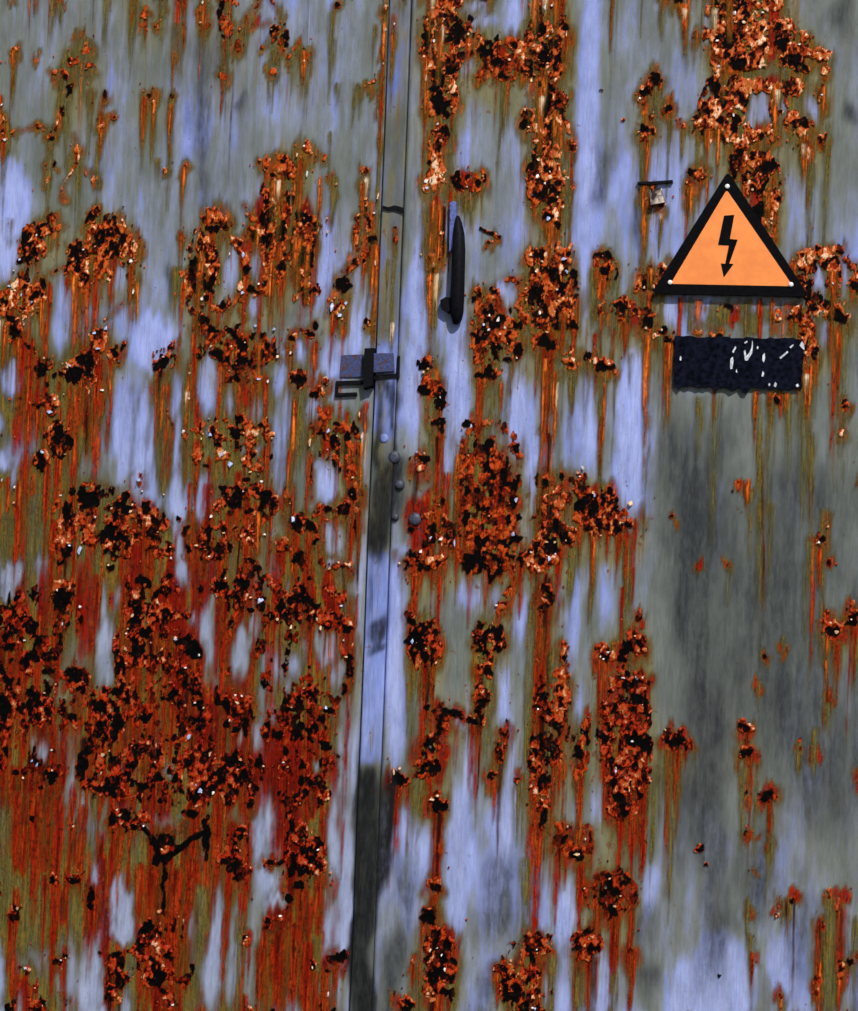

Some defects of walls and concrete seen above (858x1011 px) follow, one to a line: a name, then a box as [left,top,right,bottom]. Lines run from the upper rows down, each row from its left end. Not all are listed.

corrosion [0,0,109,182]
corrosion [129,0,169,58]
corrosion [194,0,314,138]
corrosion [329,0,344,77]
corrosion [0,88,399,1011]
crack [141,808,213,911]